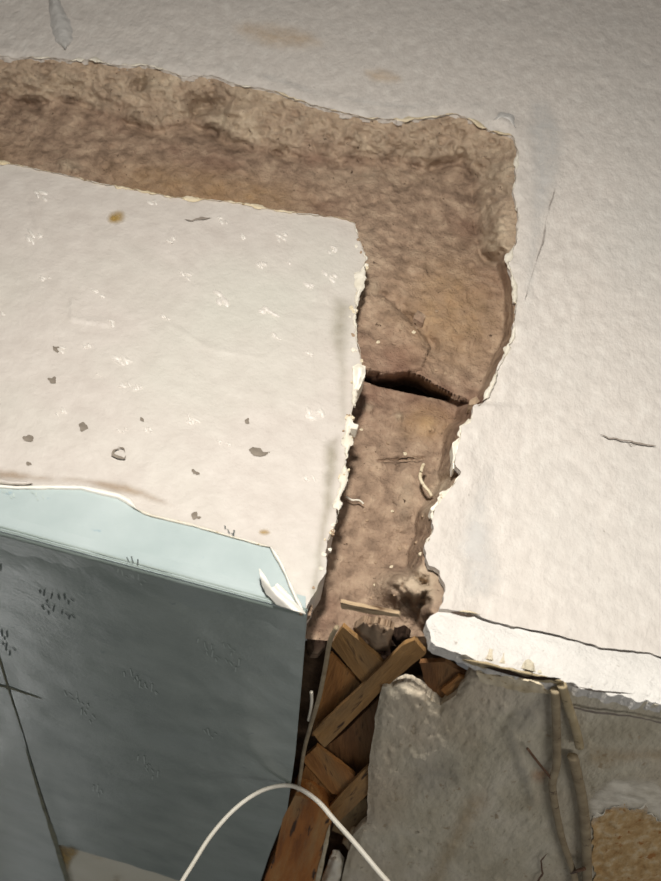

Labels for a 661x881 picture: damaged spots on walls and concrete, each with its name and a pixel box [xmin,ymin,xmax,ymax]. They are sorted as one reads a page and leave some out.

flaking render [0,56,520,641]
crack [383,385,432,398]
crack [452,609,480,617]